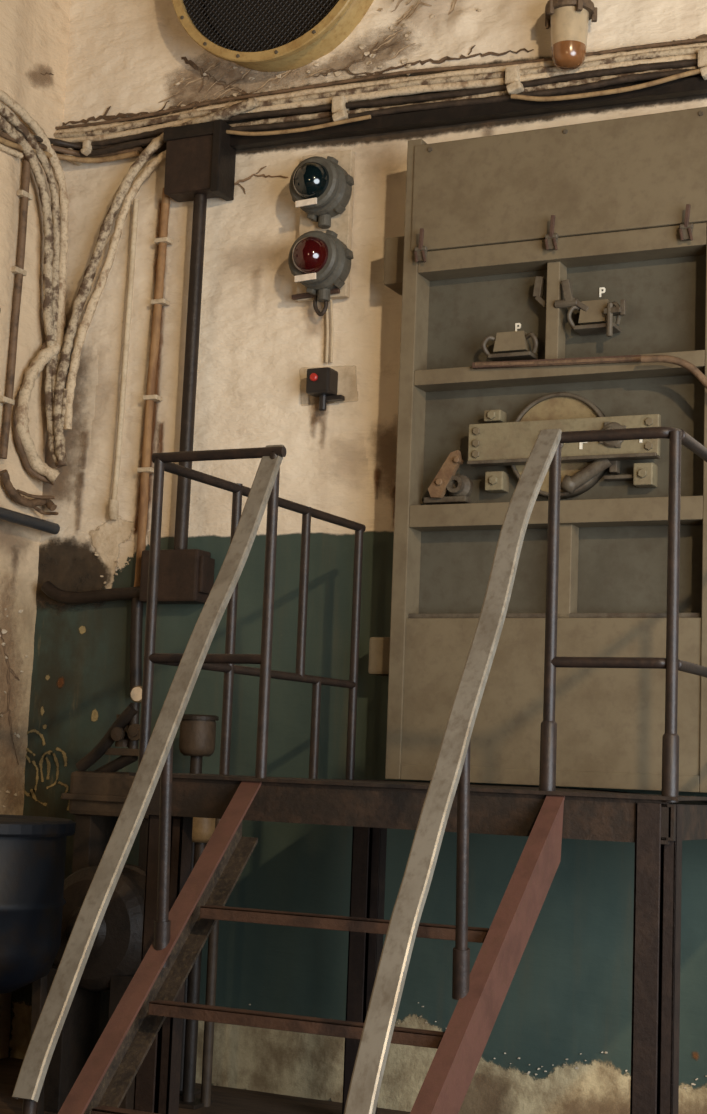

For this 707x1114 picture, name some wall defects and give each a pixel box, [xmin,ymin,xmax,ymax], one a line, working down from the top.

leakage [36,303,110,612]
peeling [9,1001,32,1059]
peeling [395,1002,442,1032]
peeling [196,1021,345,1103]
peeling [377,1043,437,1112]
peeling [470,1051,631,1114]
peeling [678,1076,707,1114]